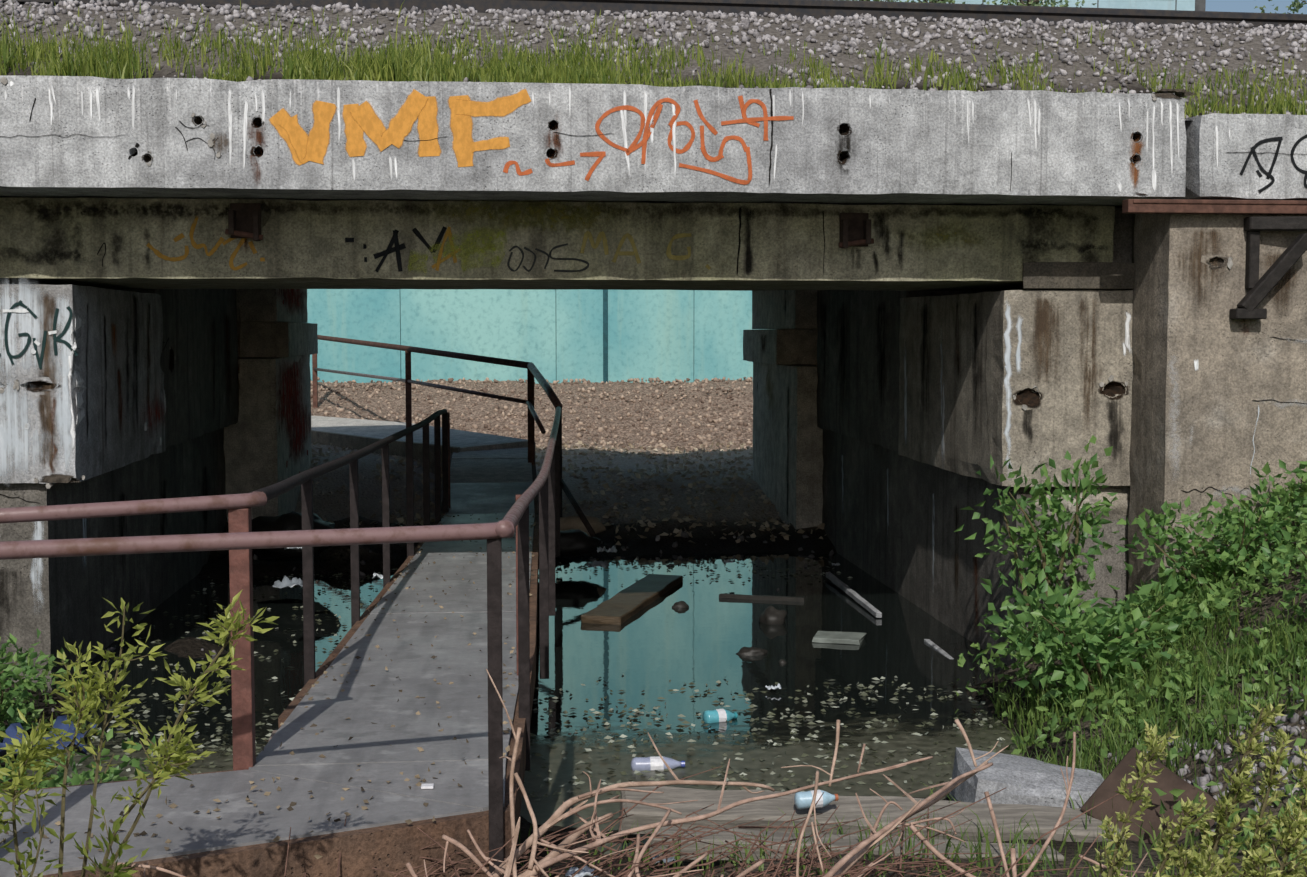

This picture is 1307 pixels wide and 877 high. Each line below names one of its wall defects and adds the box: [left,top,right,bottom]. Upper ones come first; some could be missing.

rust [1130,132,1142,185]
water stain [1,200,117,262]
water stain [600,205,850,274]